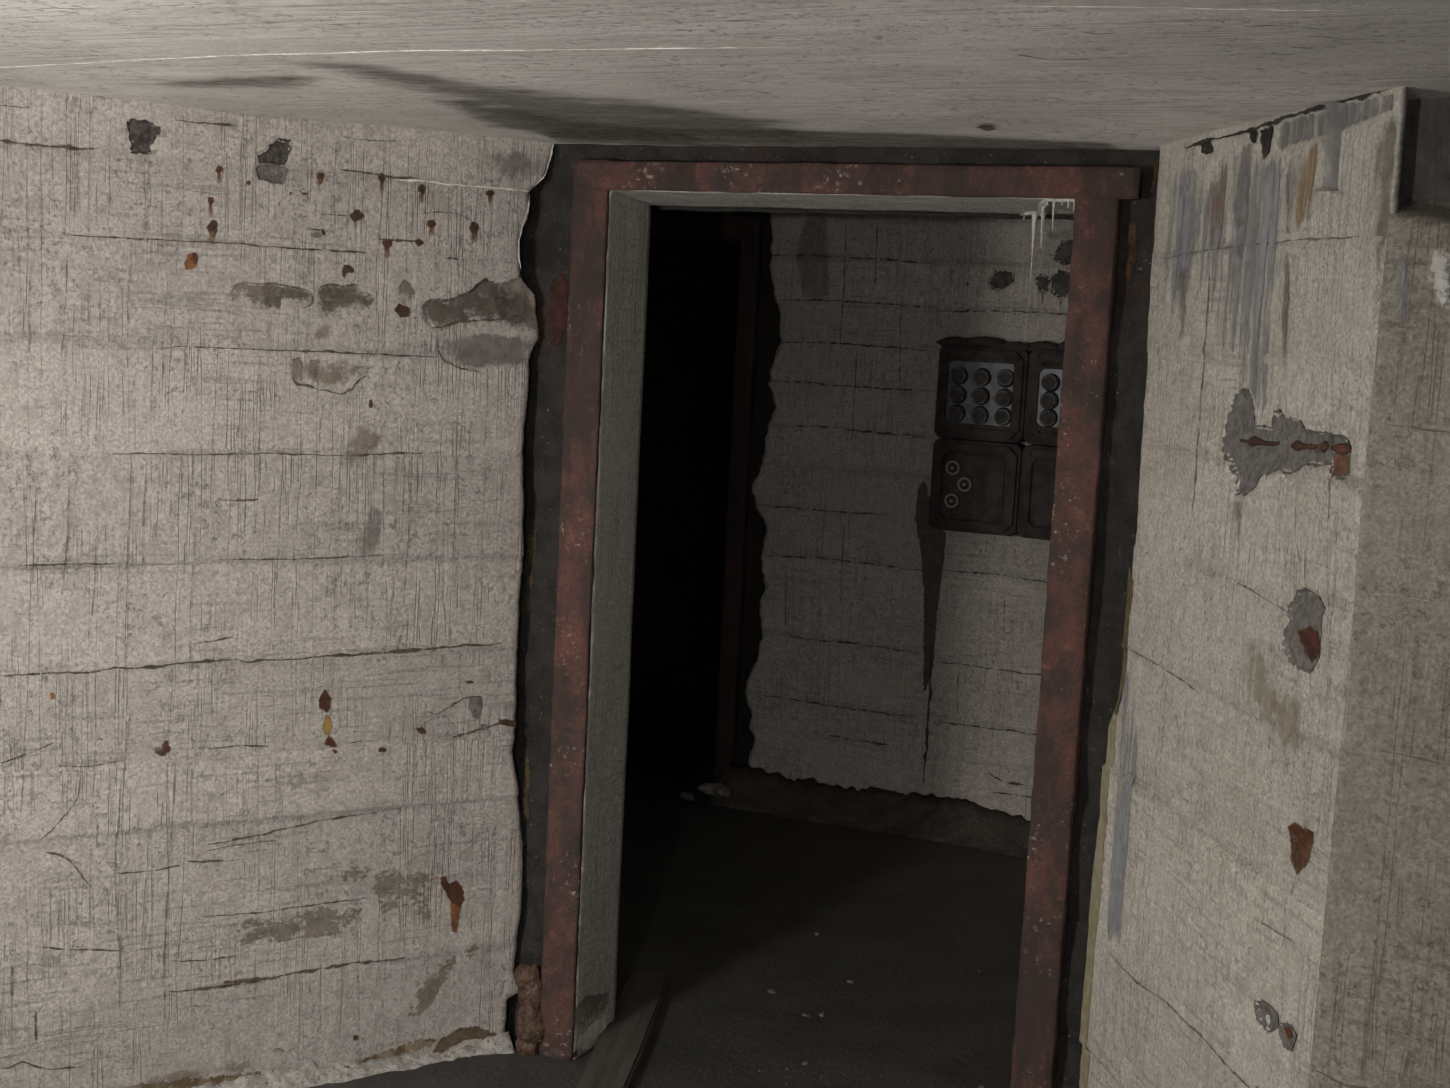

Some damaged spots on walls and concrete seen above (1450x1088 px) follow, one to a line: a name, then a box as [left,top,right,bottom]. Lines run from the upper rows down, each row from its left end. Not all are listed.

spalling [126,118,161,155]
corrosion [207,166,223,242]
damp [168,78,295,88]
corrosion [379,220,436,258]
damp [320,65,1121,152]
damp [1166,102,1349,416]
damp [1377,99,1450,245]
peeling [395,277,537,372]
spalling [1222,388,1352,496]
spalling [1282,547,1326,674]
corrosion [441,876,465,933]
corrosion [1282,823,1313,946]